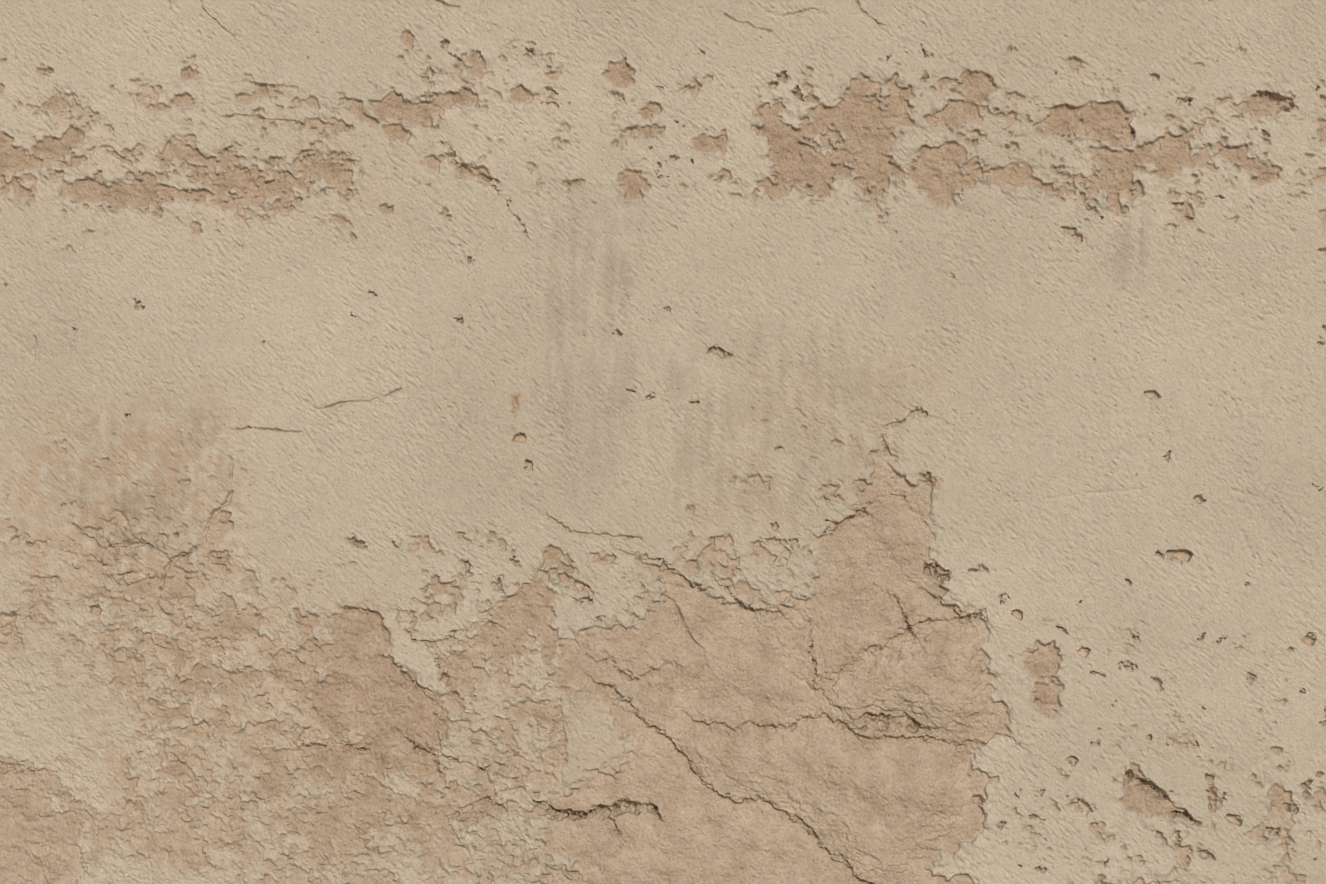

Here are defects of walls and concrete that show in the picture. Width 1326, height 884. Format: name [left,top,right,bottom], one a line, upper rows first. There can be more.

peeling [0,40,559,240]
peeling [602,59,732,201]
peeling [752,44,1299,221]
spalling [1155,550,1193,567]
peeling [0,445,1026,884]
crack [545,513,1009,884]
peeling [1021,626,1069,720]
spalling [1077,647,1165,692]
spalling [1282,633,1317,656]
spalling [1040,789,1101,830]
peeling [1119,770,1248,884]
peeling [1266,772,1324,839]